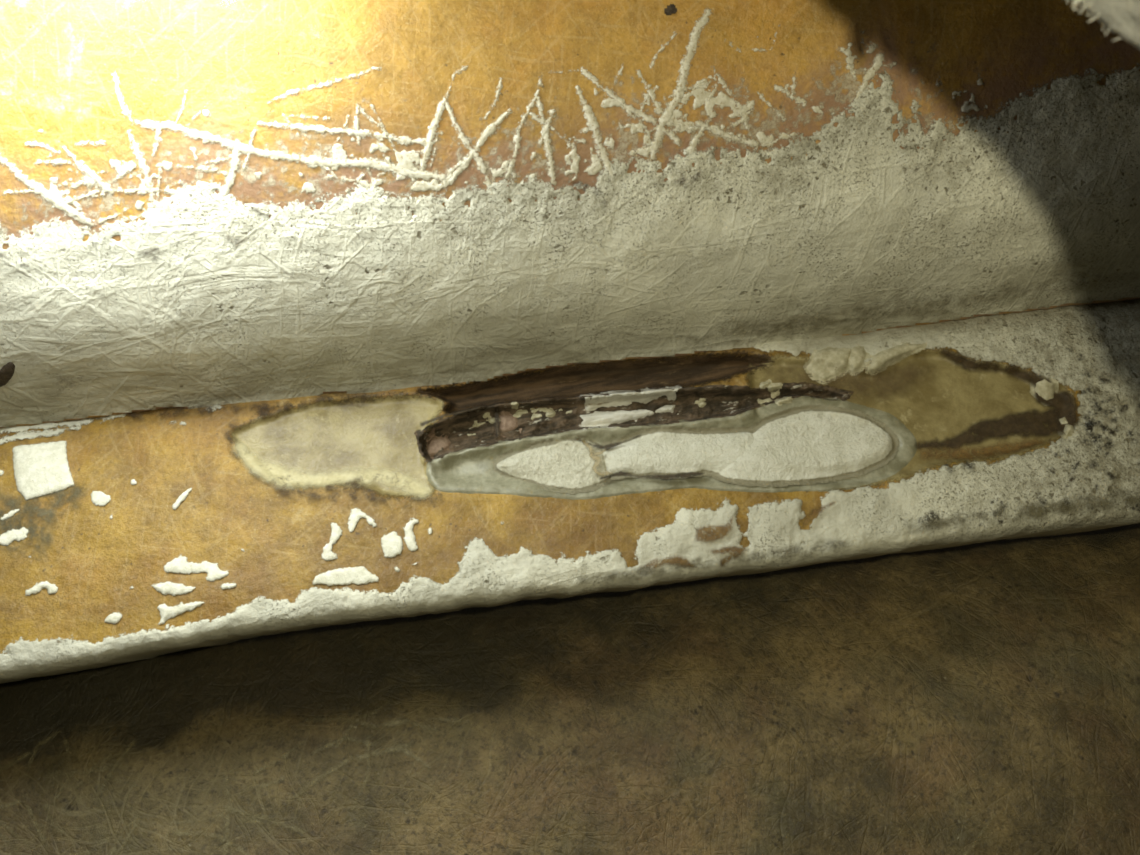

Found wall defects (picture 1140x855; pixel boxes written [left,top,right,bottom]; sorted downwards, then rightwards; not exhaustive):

peeling [803,342,927,384]
rust [416,350,775,418]
peeling [1030,375,1059,406]
peeling [0,414,126,444]
peeling [1058,417,1077,439]
peeling [91,491,112,519]
peeling [172,488,192,510]
peeling [0,509,29,546]
peeling [313,508,432,586]
peeling [25,581,58,596]
peeling [151,555,236,625]
peeling [105,612,122,624]